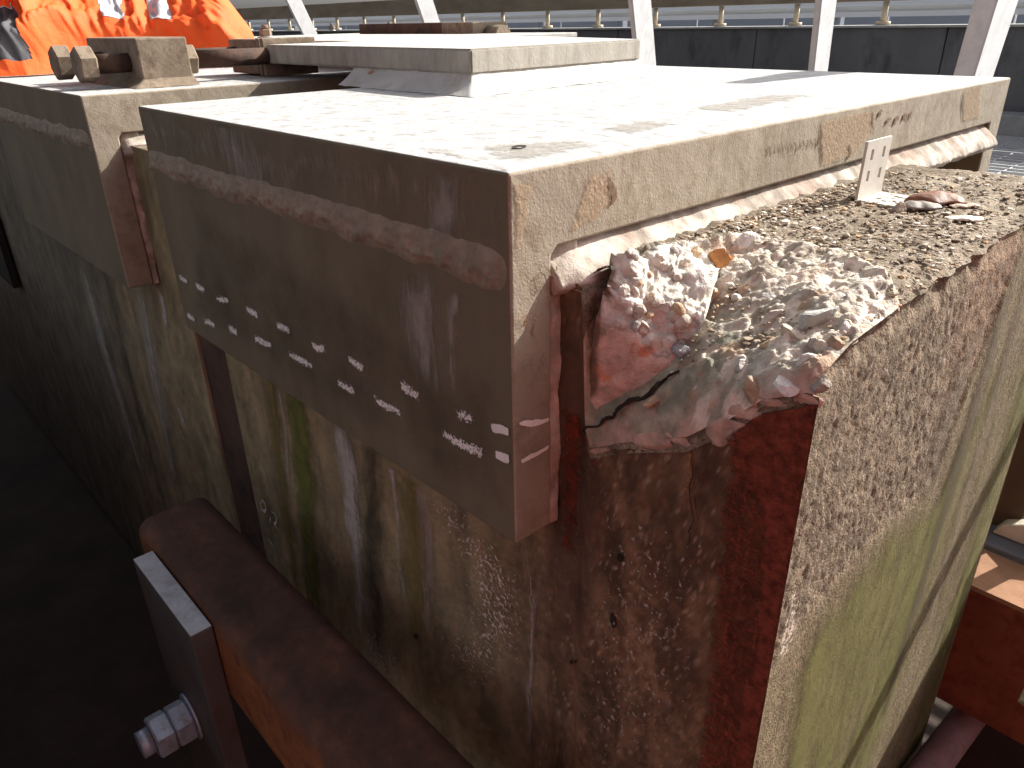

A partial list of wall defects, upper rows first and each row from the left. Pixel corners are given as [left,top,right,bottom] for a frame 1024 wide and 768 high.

water stain [269,382,318,605]
water stain [336,429,381,649]
crack [582,370,680,435]
spalling [583,231,900,454]
corrosion [697,404,816,768]